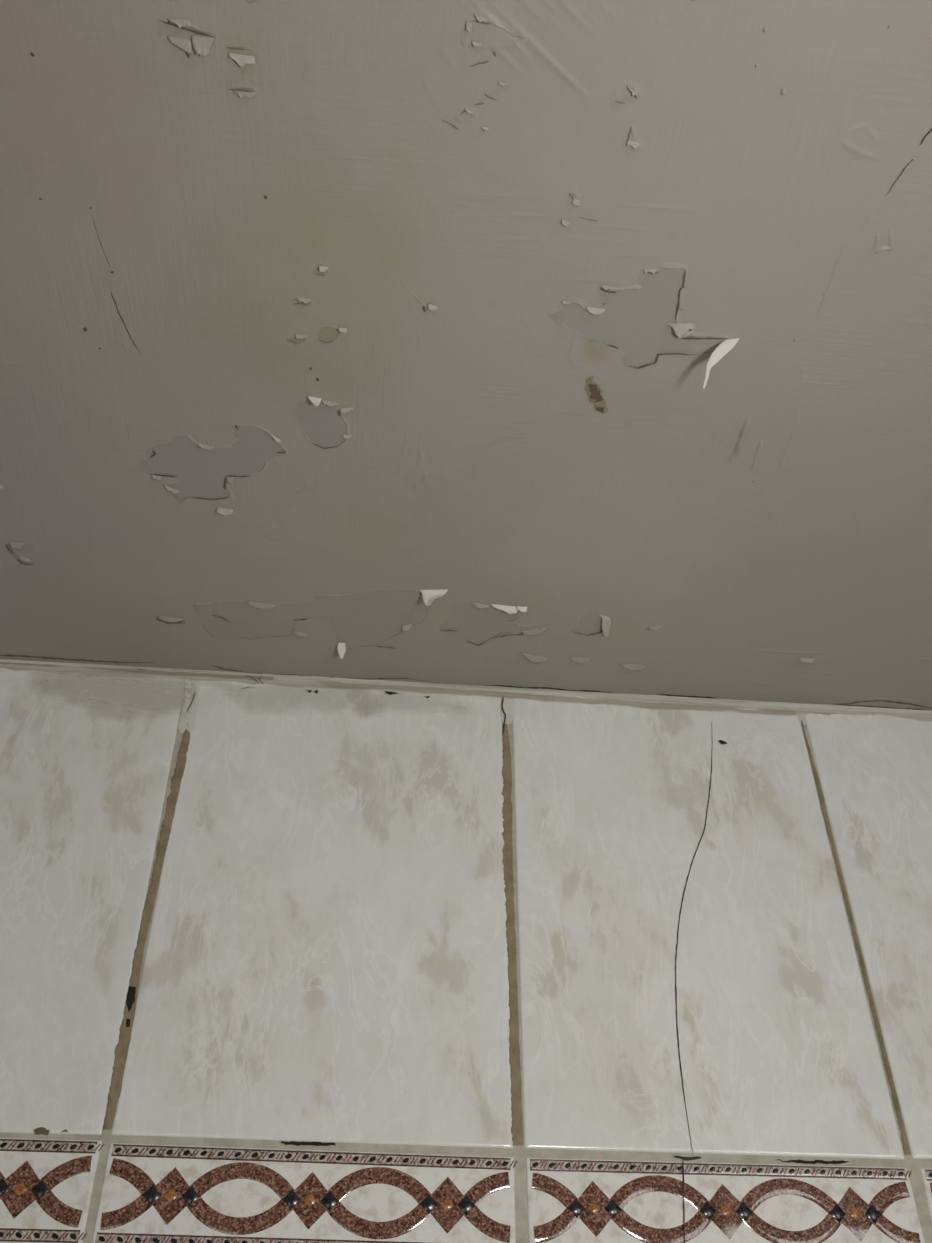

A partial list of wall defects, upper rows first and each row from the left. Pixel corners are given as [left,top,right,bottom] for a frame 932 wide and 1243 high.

peeling [154,18,257,68]
peeling [547,262,739,389]
peeling [291,396,354,452]
peeling [438,602,549,647]
crack [674,741,713,1243]